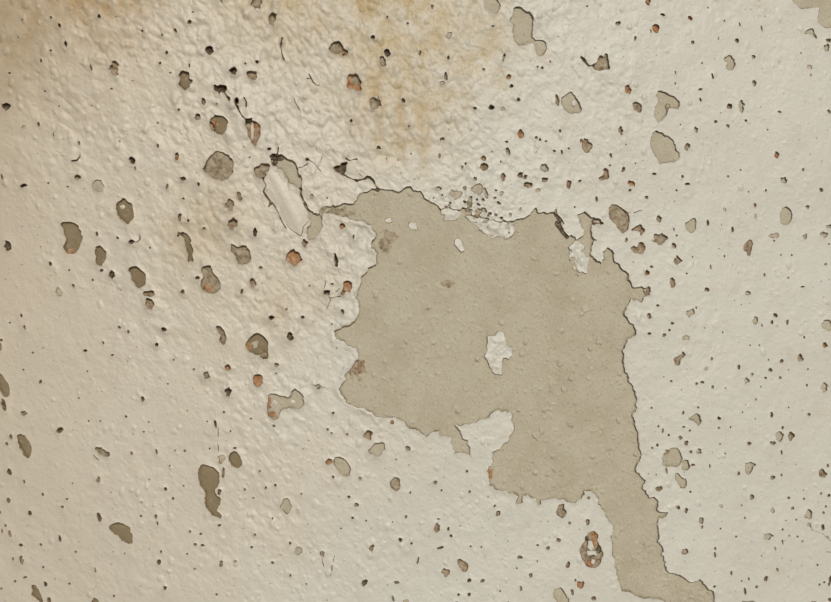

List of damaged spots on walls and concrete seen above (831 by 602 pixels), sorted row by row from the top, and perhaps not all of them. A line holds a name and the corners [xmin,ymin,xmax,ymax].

peeling [510,7,547,56]
peeling [792,0,831,38]
peeling [650,91,690,164]
peeling [254,152,714,602]
peeling [198,452,242,518]